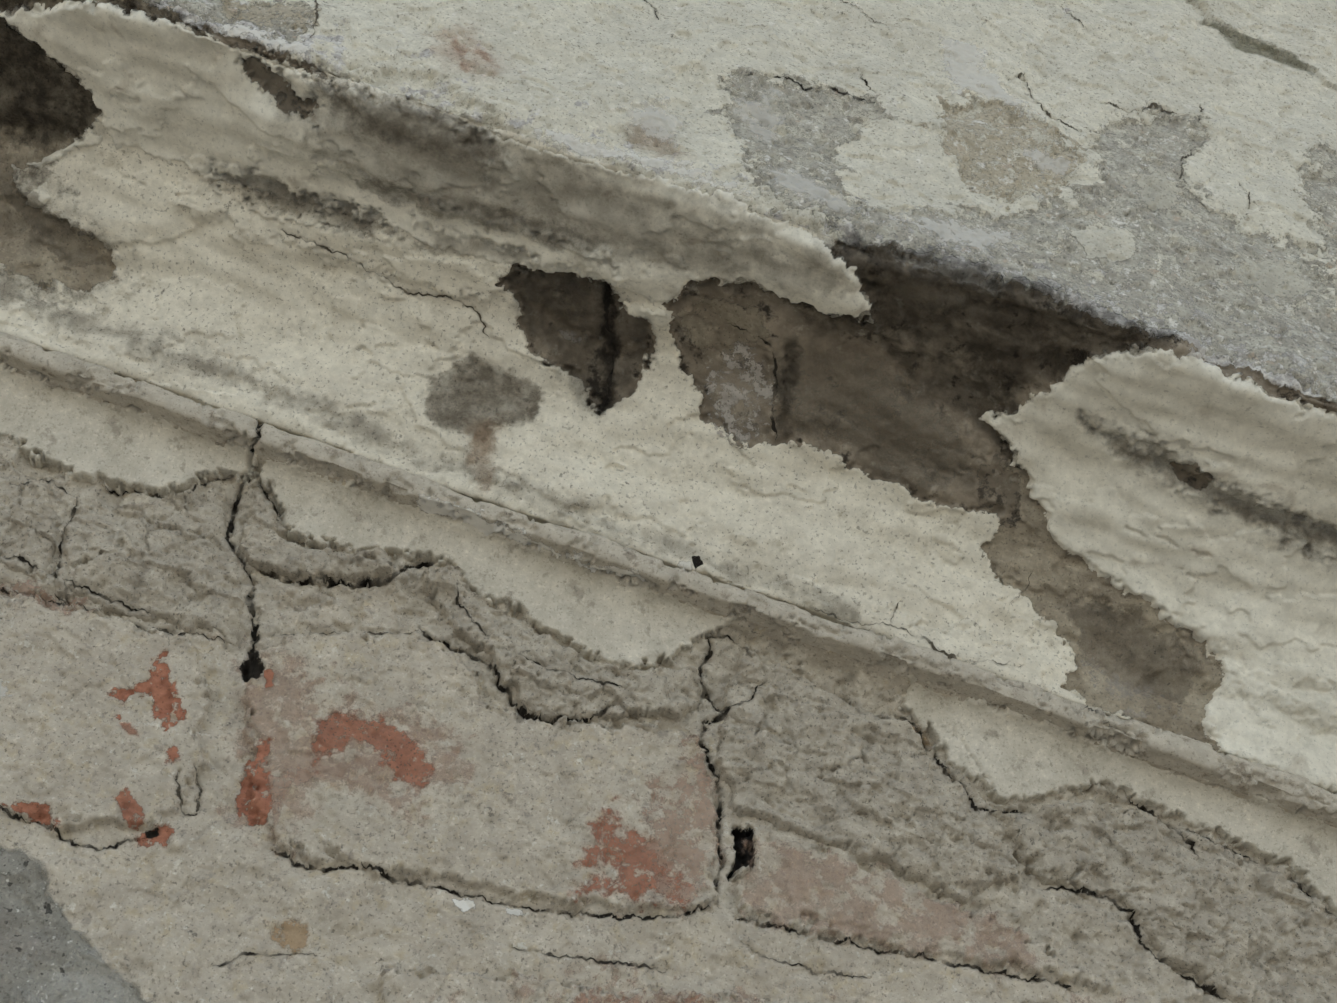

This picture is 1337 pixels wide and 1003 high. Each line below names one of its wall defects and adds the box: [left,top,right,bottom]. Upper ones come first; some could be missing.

leakage [426,358,541,462]
flaking render [0,0,1337,793]
crack [0,423,430,682]
crack [368,591,621,723]
crack [813,603,956,659]
peeling [2,801,61,831]
crack [0,805,128,851]
peeling [115,787,174,848]
crack [175,766,202,816]
peeling [236,710,435,826]
crack [272,635,1073,992]
crack [1045,886,1224,999]